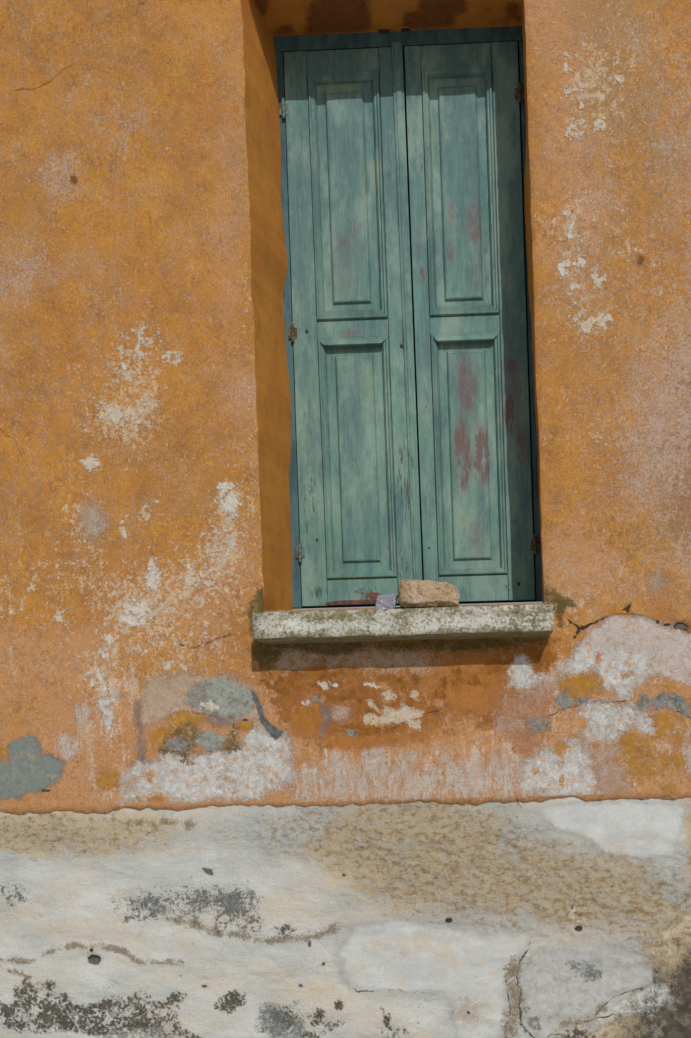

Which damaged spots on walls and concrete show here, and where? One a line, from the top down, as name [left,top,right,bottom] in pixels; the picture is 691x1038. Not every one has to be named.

peeling [93,321,184,434]
peeling [53,556,163,761]
flaking render [94,691,298,806]
flaking render [318,682,446,752]
flaking render [507,604,691,796]
crack [568,613,691,639]
water stain [119,881,297,940]
water stain [0,978,209,1038]
water stain [214,989,247,1014]
water stain [255,999,348,1038]
crack [504,941,648,1038]
water stain [561,931,691,1038]